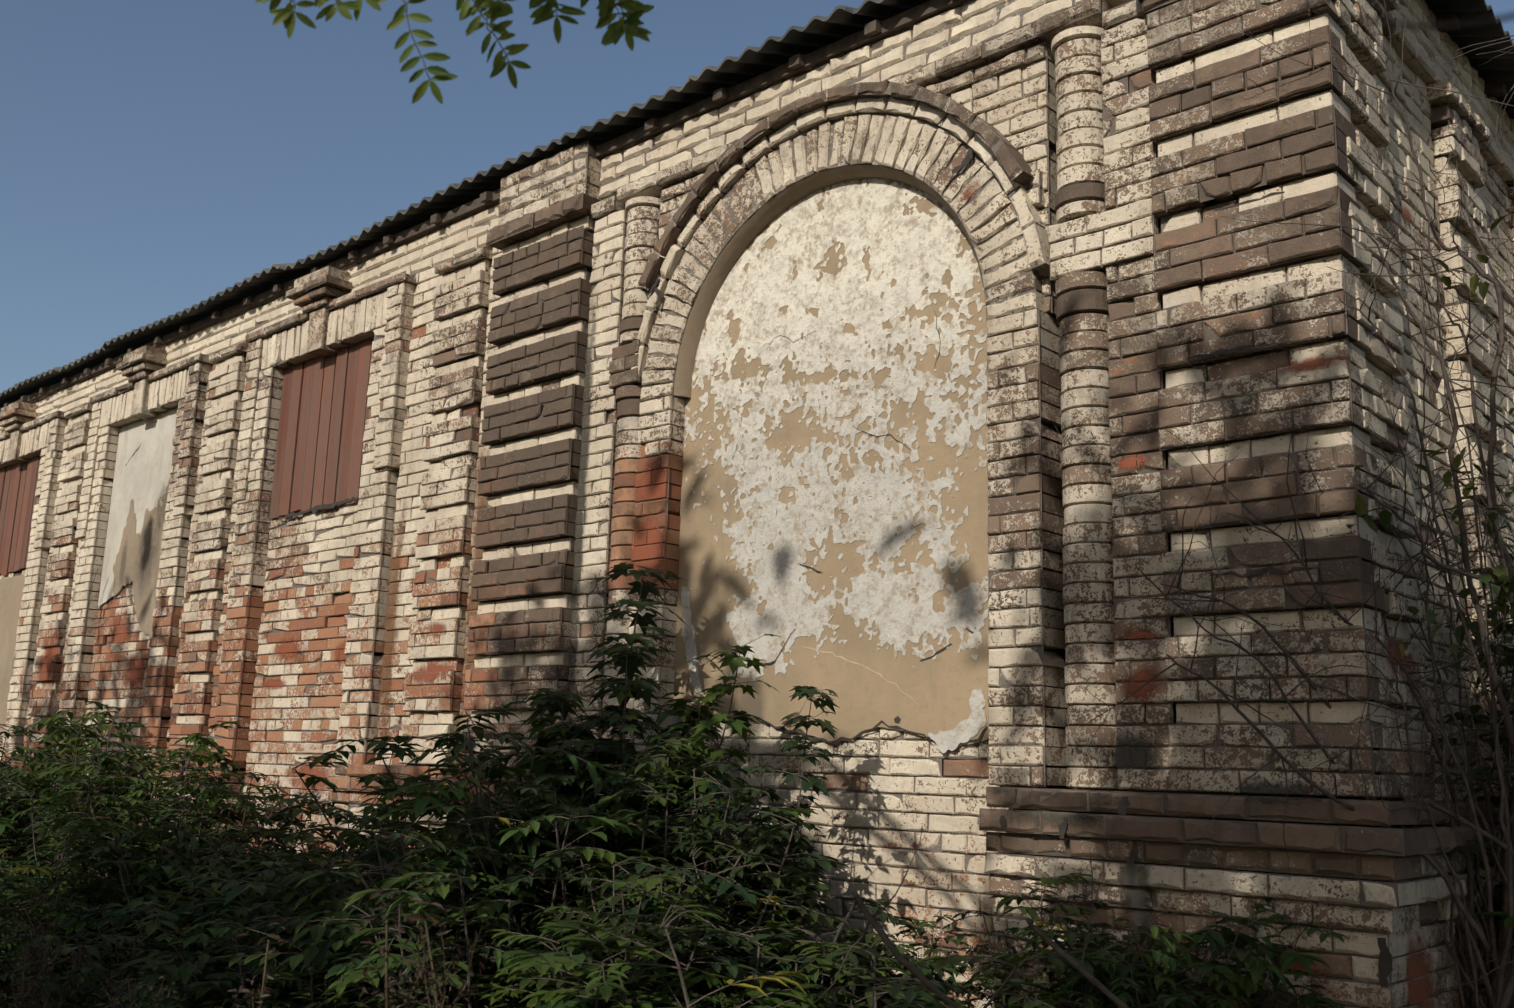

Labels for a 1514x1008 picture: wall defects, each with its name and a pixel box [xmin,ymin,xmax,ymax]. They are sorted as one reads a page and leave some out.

peeling [684,178,988,686]
flaking render [109,478,170,688]
peeling [335,642,346,663]
peeling [429,623,446,636]
peeling [681,586,706,696]
peeling [264,679,284,689]
peeling [412,663,451,683]
peeling [928,689,987,753]
peeling [291,763,328,792]